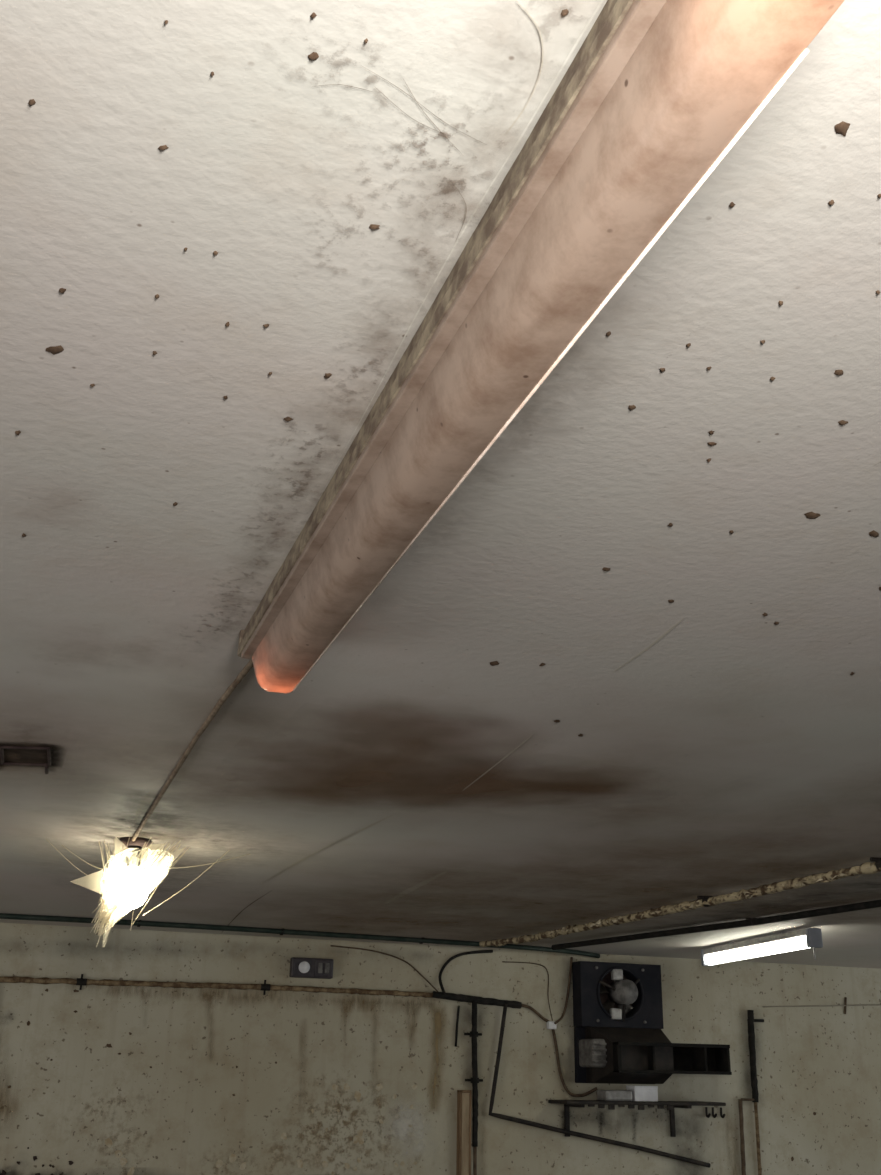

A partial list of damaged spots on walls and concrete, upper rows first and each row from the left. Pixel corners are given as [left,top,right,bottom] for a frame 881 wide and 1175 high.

damp [289,739,604,799]
peeling [527,911,661,938]